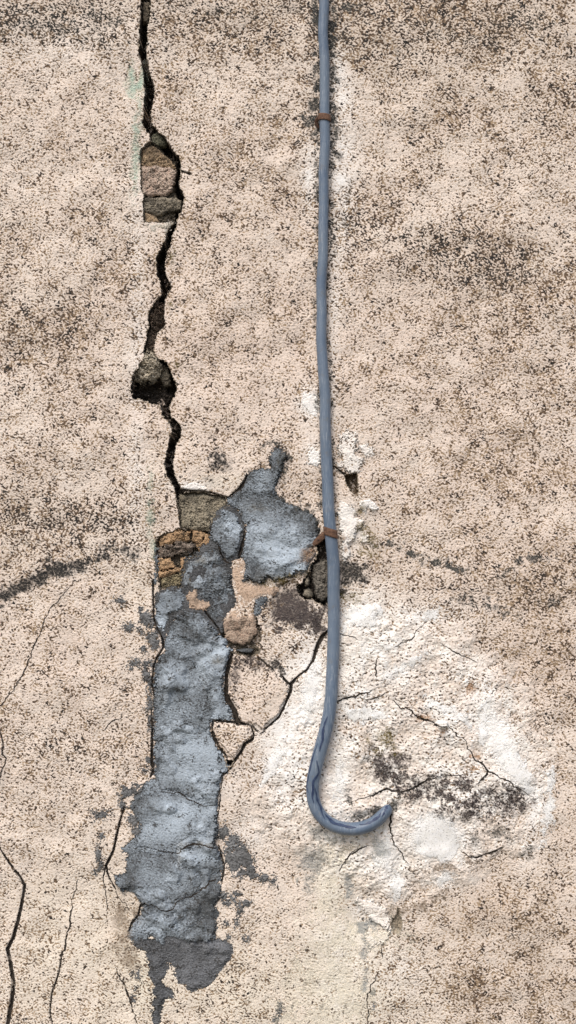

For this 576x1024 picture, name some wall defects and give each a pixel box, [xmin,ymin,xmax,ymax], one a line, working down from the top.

crack [137,0,247,520]
spalling [153,482,228,612]
peeling [214,559,289,767]
crack [150,580,358,818]
leakage [265,587,328,638]
spalling [296,540,328,606]
crack [339,622,534,871]
leakage [345,727,536,871]
crack [0,847,26,1024]
leakage [288,902,383,1024]